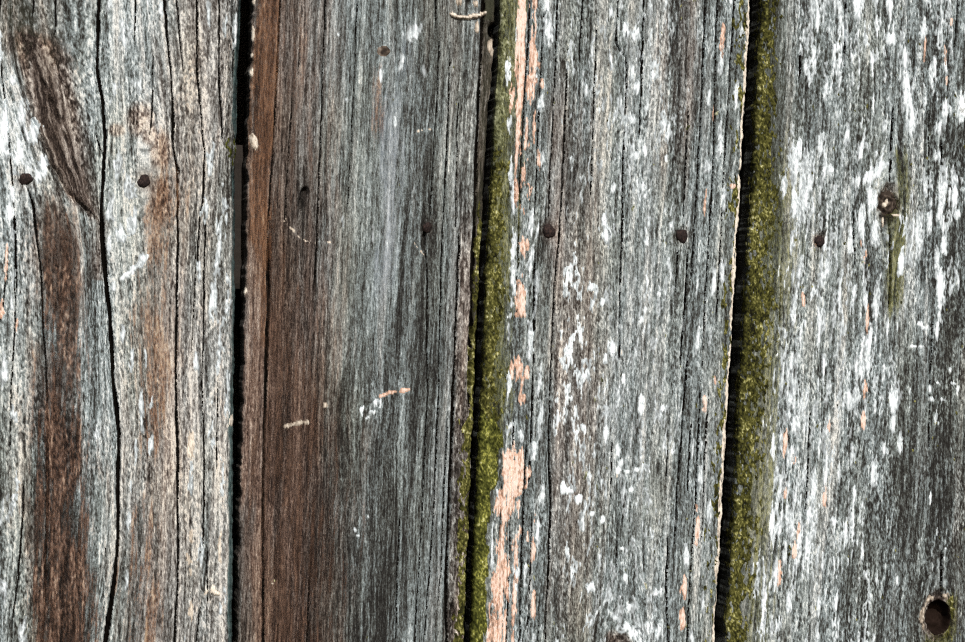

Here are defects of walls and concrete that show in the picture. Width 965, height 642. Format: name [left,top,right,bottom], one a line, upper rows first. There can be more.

crack [95,0,121,642]
leakage [483,0,527,434]
crack [496,0,645,642]
peeling [486,0,750,642]
leakage [749,187,791,585]